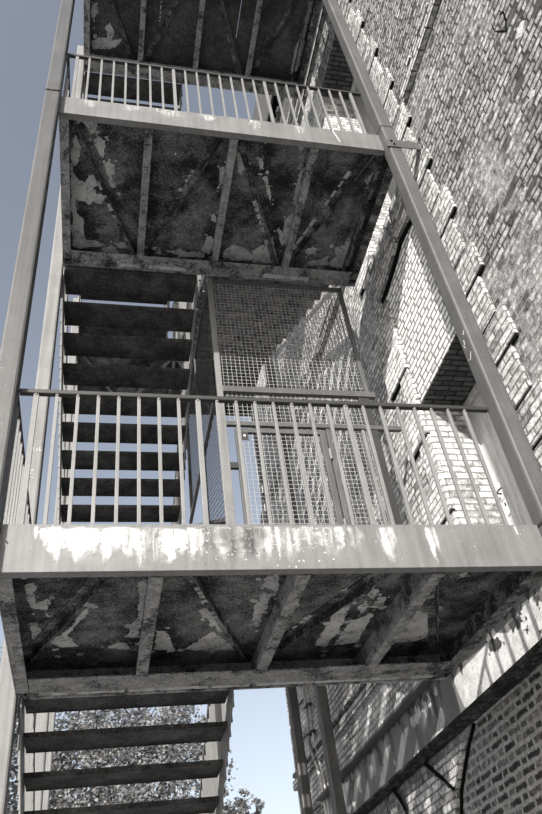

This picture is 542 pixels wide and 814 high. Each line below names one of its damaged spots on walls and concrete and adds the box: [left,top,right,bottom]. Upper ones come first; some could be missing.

peeling [91,2,121,55]
peeling [70,121,381,281]
peeling [21,578,55,640]
peeling [51,603,98,657]
peeling [102,580,148,650]
peeling [151,587,234,654]
peeling [247,575,280,632]
peeling [315,585,390,656]
peeling [395,611,428,643]
peeling [450,589,542,707]